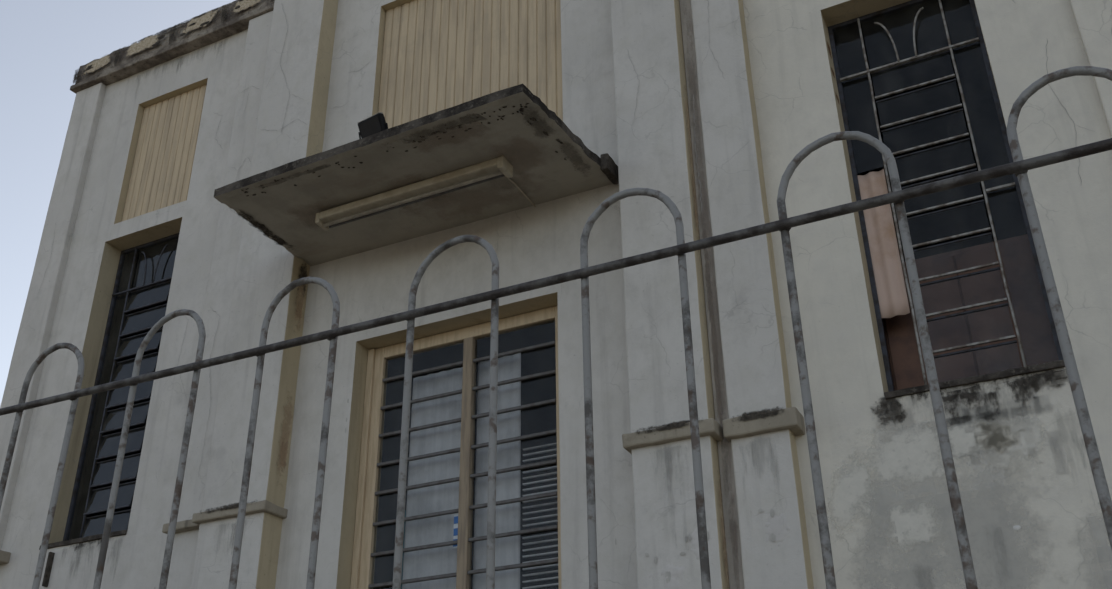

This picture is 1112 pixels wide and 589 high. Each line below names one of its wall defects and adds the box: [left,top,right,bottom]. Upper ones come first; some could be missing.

flaking render [234,0,260,12]
flaking render [179,9,218,37]
flaking render [127,35,165,56]
flaking render [83,55,110,74]
leakage [872,392,927,425]
leakage [940,367,1068,420]
peeling [685,528,711,560]
leakage [867,469,1031,589]
leakage [1086,518,1112,589]